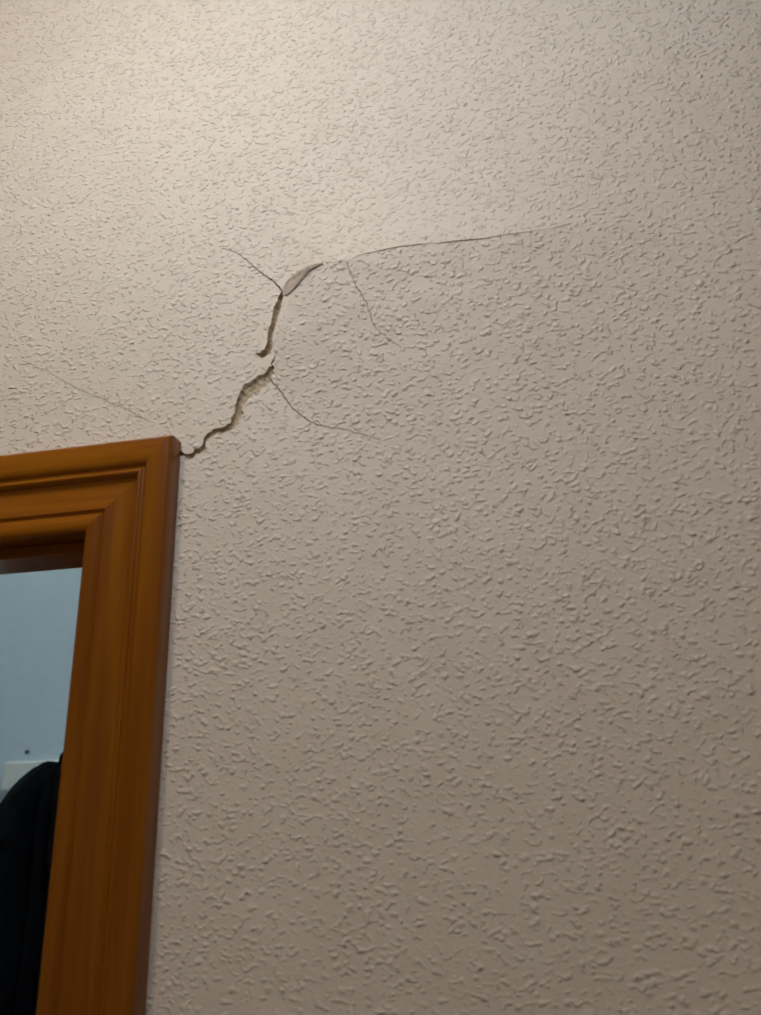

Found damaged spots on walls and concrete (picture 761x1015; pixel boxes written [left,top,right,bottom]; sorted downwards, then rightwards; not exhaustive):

crack [313,222,573,349]
crack [23,361,148,421]
crack [180,248,378,460]